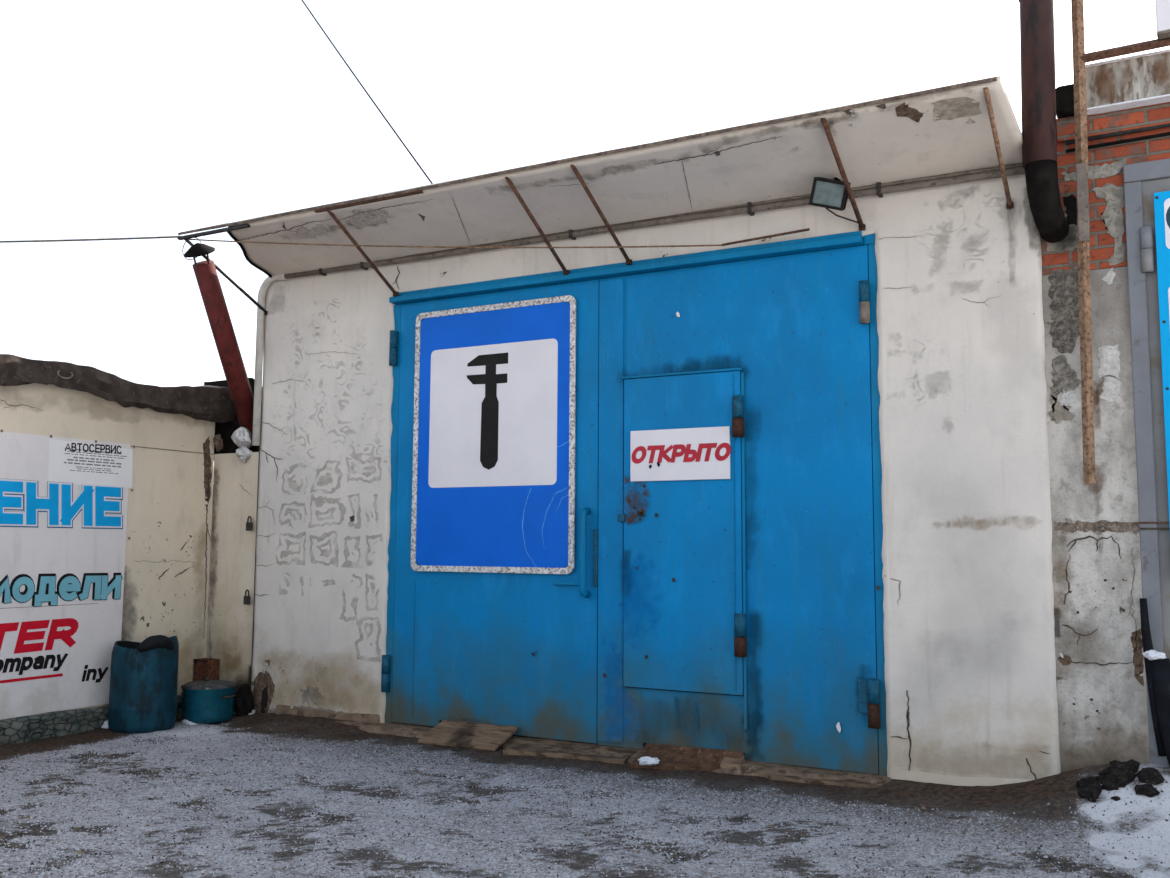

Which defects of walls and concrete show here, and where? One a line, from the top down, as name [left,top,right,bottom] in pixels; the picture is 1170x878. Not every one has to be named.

peeling [876,97,981,125]
spalling [1063,194,1077,225]
spalling [1102,267,1116,285]
spalling [1045,267,1082,424]
spalling [1097,345,1121,403]
crack [239,422,288,566]
rust [625,478,649,524]
crack [1062,535,1137,666]
spalling [1128,629,1145,686]
crack [893,690,911,771]